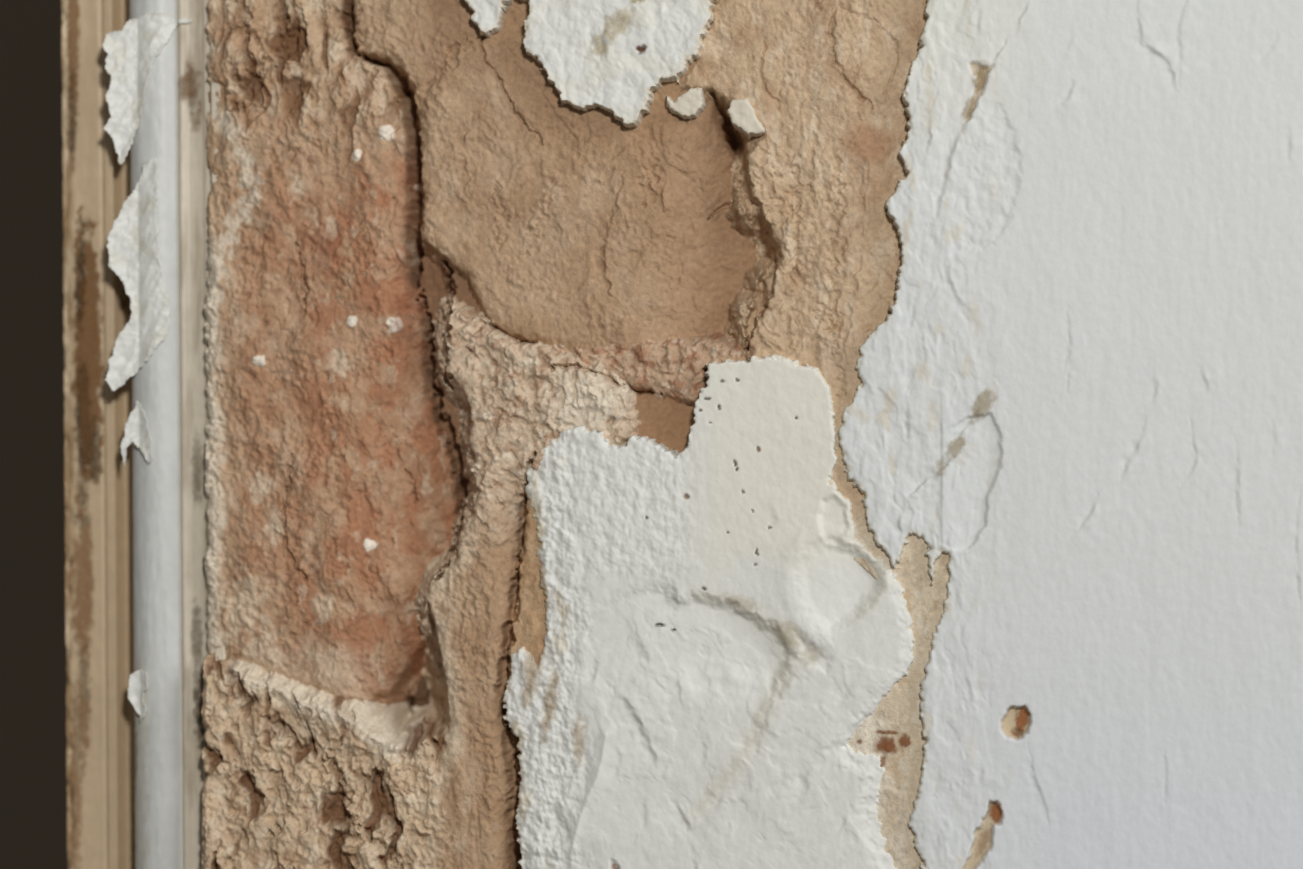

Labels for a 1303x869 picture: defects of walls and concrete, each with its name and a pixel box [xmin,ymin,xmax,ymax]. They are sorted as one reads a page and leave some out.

peeling [67,0,79,162]
crack [357,50,426,294]
crack [479,36,544,148]
crack [599,170,626,276]
crack [701,81,781,356]
crack [755,42,781,105]
peeling [71,158,170,483]
spalling [102,0,1007,869]
crack [484,322,664,398]
peeling [71,495,93,653]
crack [490,451,538,869]
rust [1013,708,1029,736]